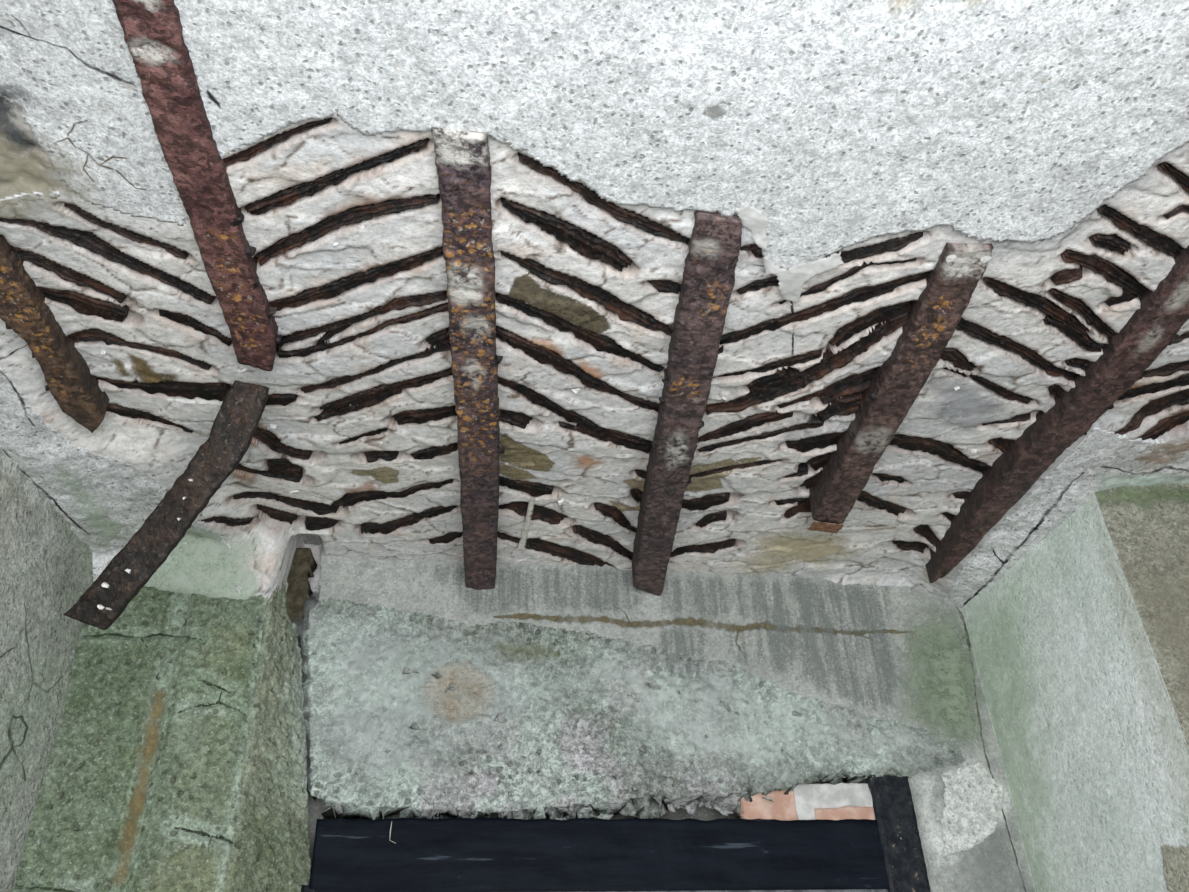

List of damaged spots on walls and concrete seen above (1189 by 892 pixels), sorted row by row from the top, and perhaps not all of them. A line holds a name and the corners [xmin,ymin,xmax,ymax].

crack [0,14,136,86]
leakage [0,90,60,216]
corrosion [231,212,244,227]
corrosion [245,245,256,258]
spalling [667,143,1189,602]
corrosion [233,470,255,483]
spalling [0,99,1004,858]
crack [960,466,1189,779]
crack [0,602,63,782]
crack [1002,809,1026,892]
peeling [1161,845,1189,892]